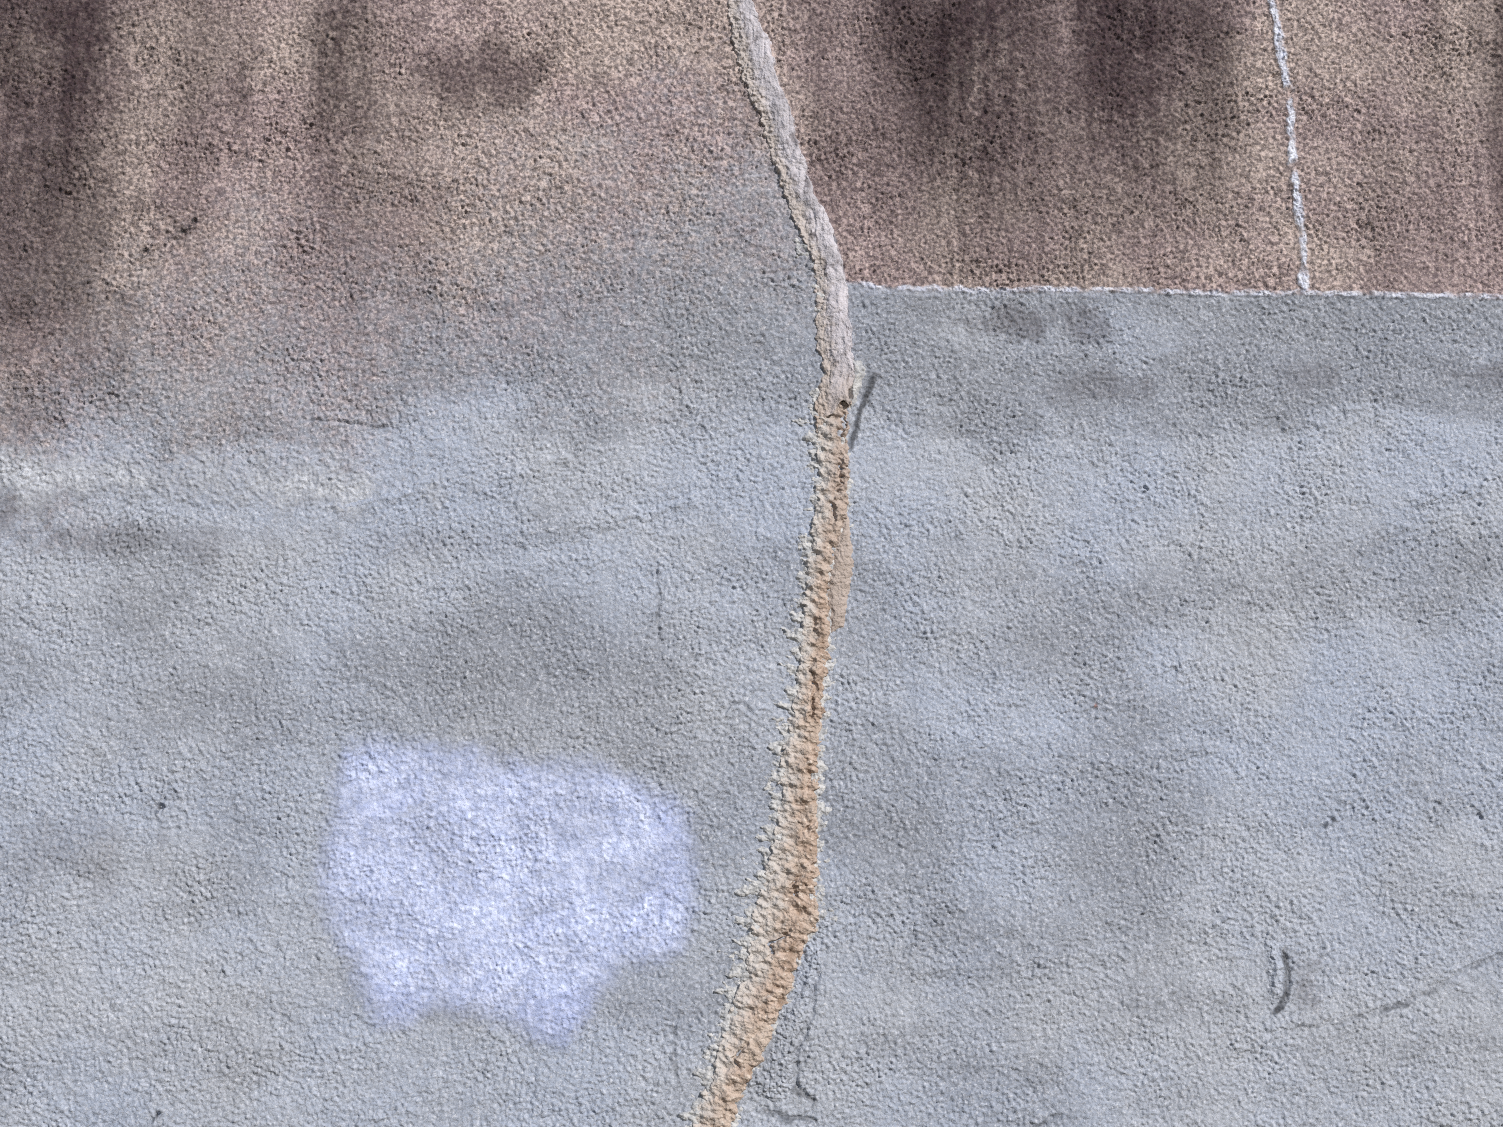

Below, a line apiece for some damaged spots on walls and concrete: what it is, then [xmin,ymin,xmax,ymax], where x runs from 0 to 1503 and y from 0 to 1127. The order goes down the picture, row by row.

damp [0,0,110,230]
damp [318,0,353,116]
damp [881,0,1036,195]
damp [1073,0,1221,173]
crack [678,0,855,1127]